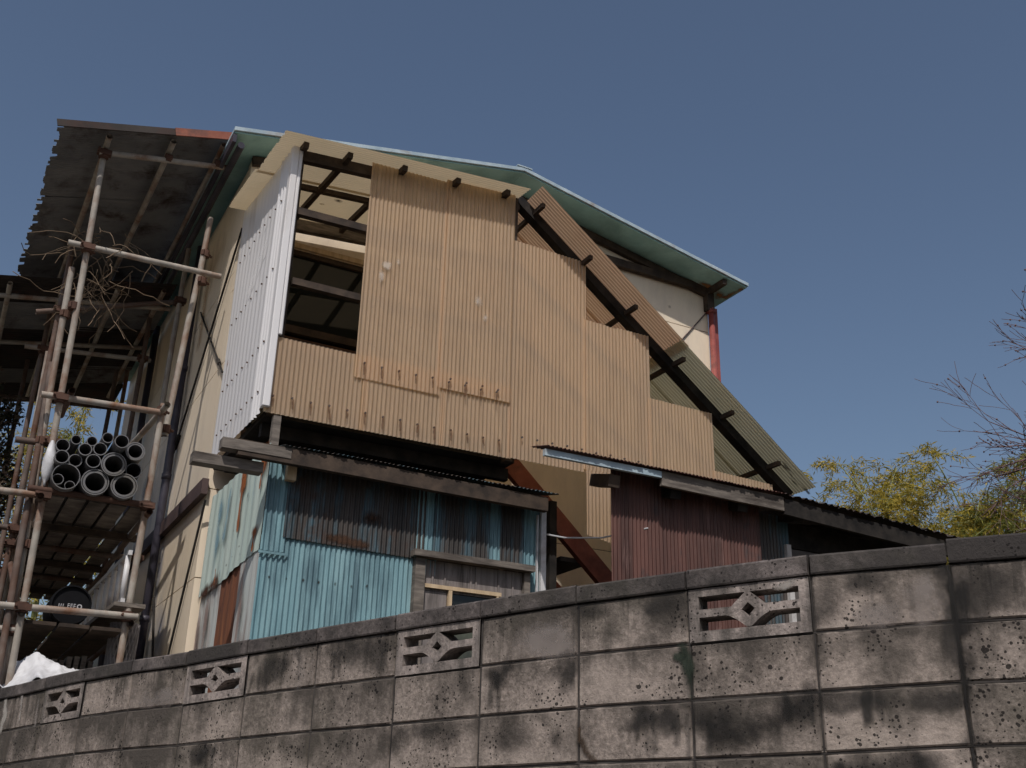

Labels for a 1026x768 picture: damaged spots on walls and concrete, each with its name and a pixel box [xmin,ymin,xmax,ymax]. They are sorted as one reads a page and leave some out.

rust [236,474,247,532]
leakage [492,661,511,686]
leakage [528,628,576,684]
leakage [679,644,694,684]
leakage [630,705,676,730]
leakage [696,690,884,743]
leakage [840,751,939,768]